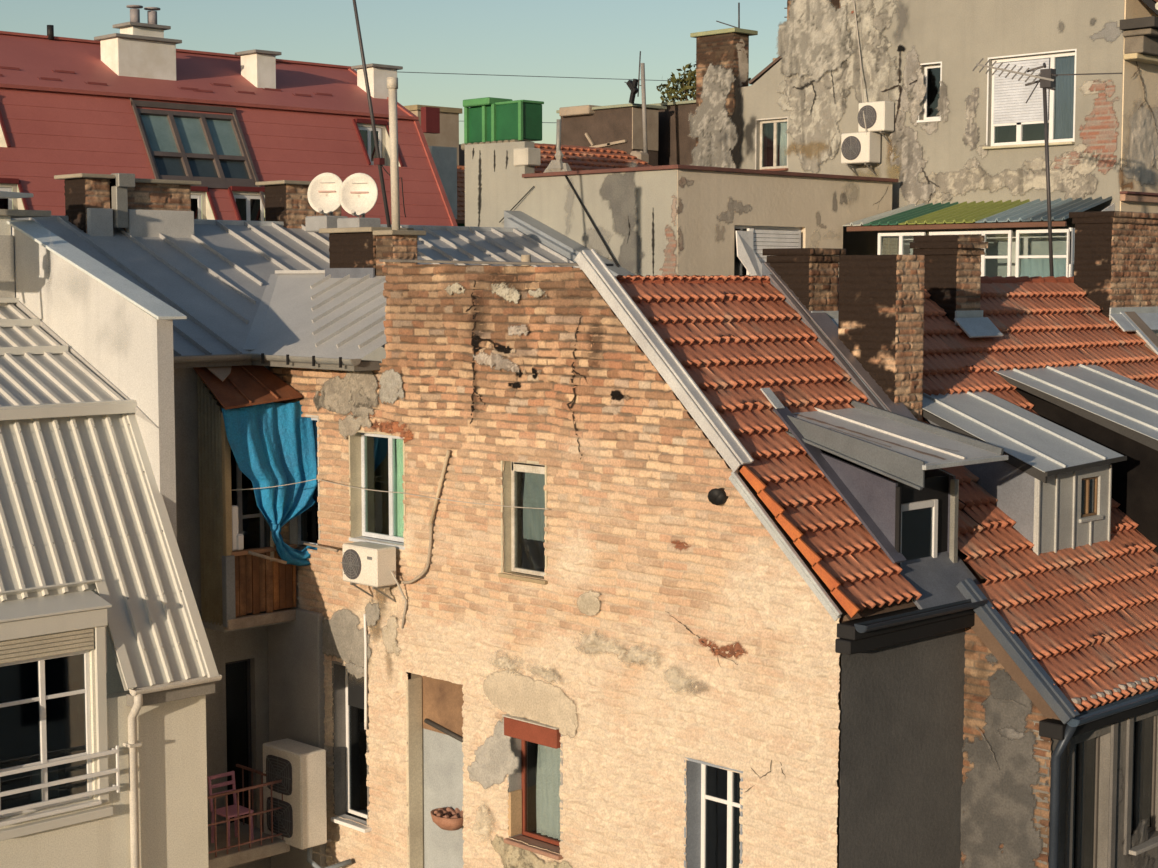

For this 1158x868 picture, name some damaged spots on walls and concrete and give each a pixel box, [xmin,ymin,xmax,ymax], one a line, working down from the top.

peeling [777,0,1158,205]
leakage [583,162,644,274]
peeling [716,198,751,240]
peeling [445,283,465,295]
peeling [471,324,529,354]